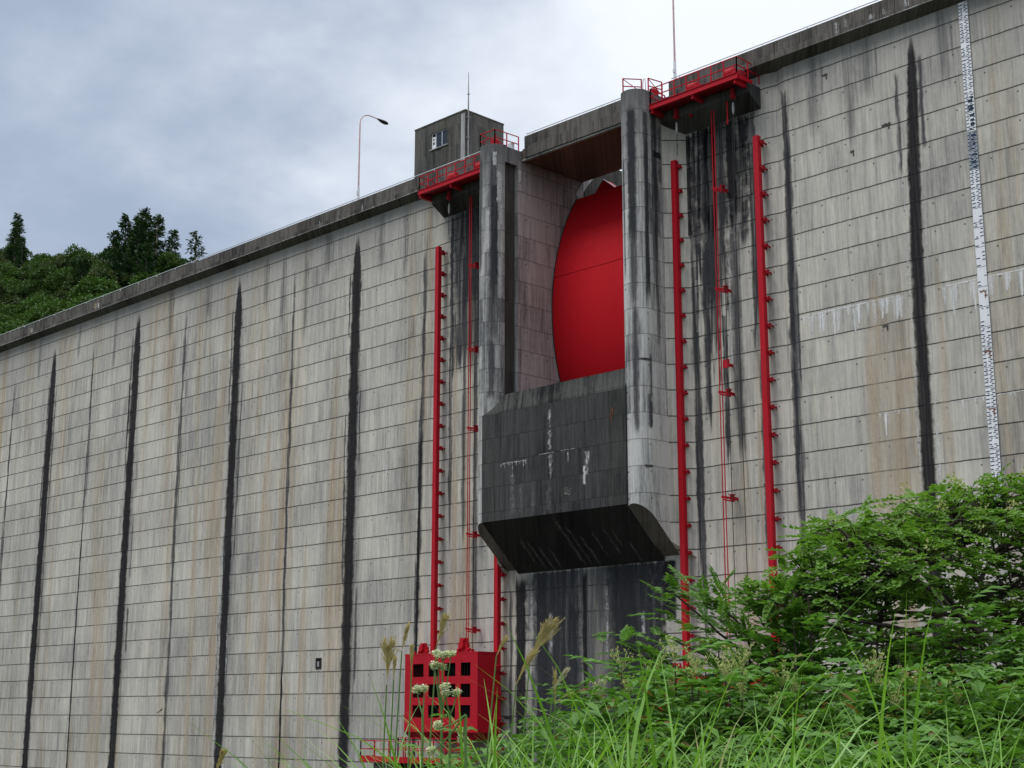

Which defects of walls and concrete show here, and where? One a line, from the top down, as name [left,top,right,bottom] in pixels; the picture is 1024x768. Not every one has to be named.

damp [22,354,57,768]
damp [107,321,140,768]
damp [212,285,242,768]
damp [338,243,362,768]
damp [448,159,498,627]
damp [686,112,759,589]
damp [781,43,941,564]